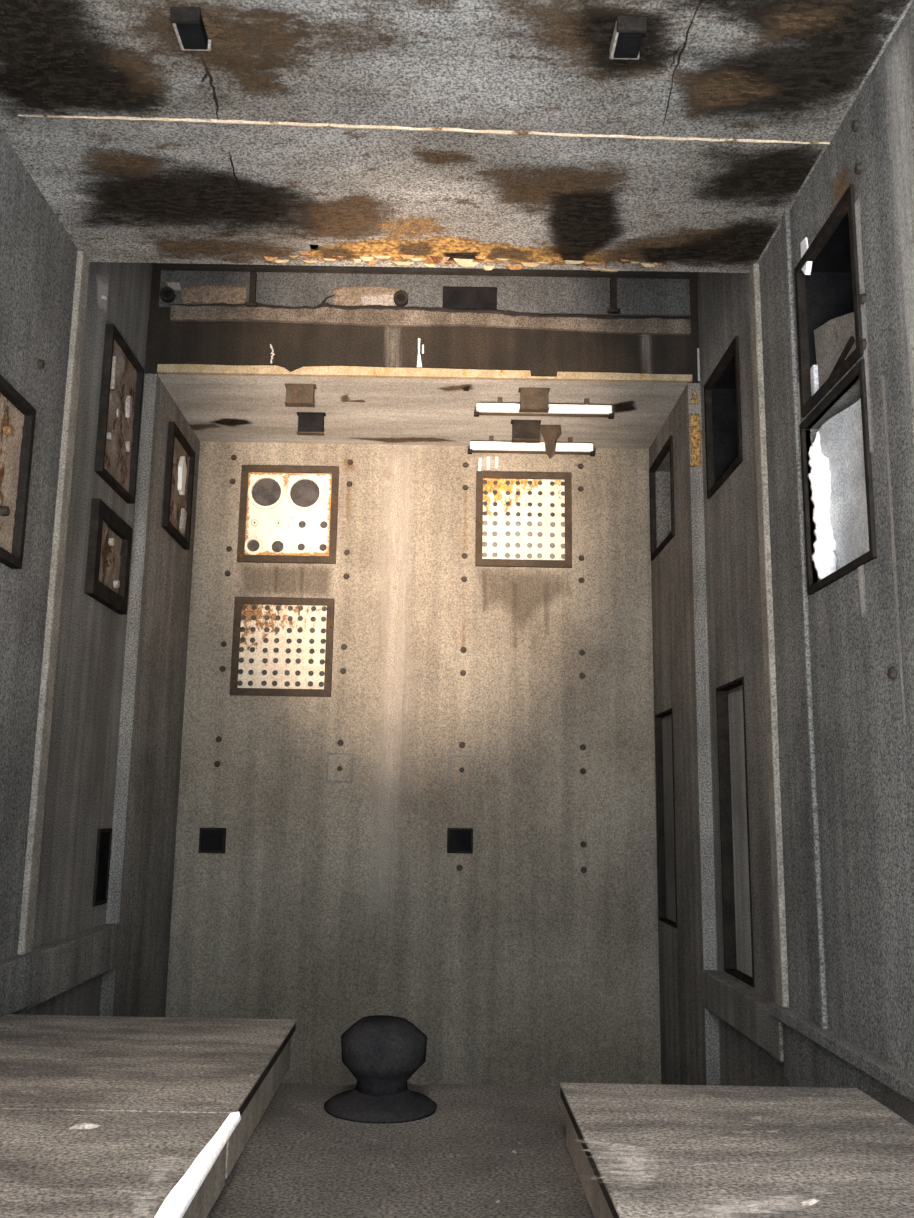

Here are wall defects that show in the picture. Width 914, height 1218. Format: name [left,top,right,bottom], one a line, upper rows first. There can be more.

water stain [0,0,396,124]
crack [201,64,219,120]
water stain [80,149,391,240]
corrosion [153,217,646,266]
water stain [414,146,821,266]
water stain [502,0,914,429]